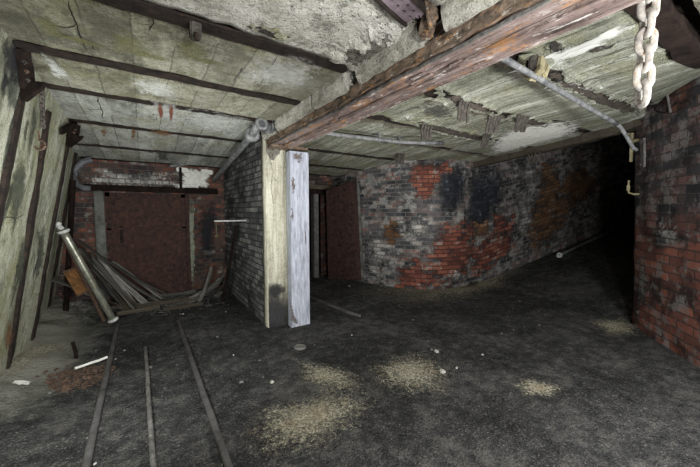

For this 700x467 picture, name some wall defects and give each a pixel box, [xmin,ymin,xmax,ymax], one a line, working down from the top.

crack [52,2,94,49]
spalling [322,21,405,71]
peeling [404,86,517,144]
peeling [527,117,553,127]